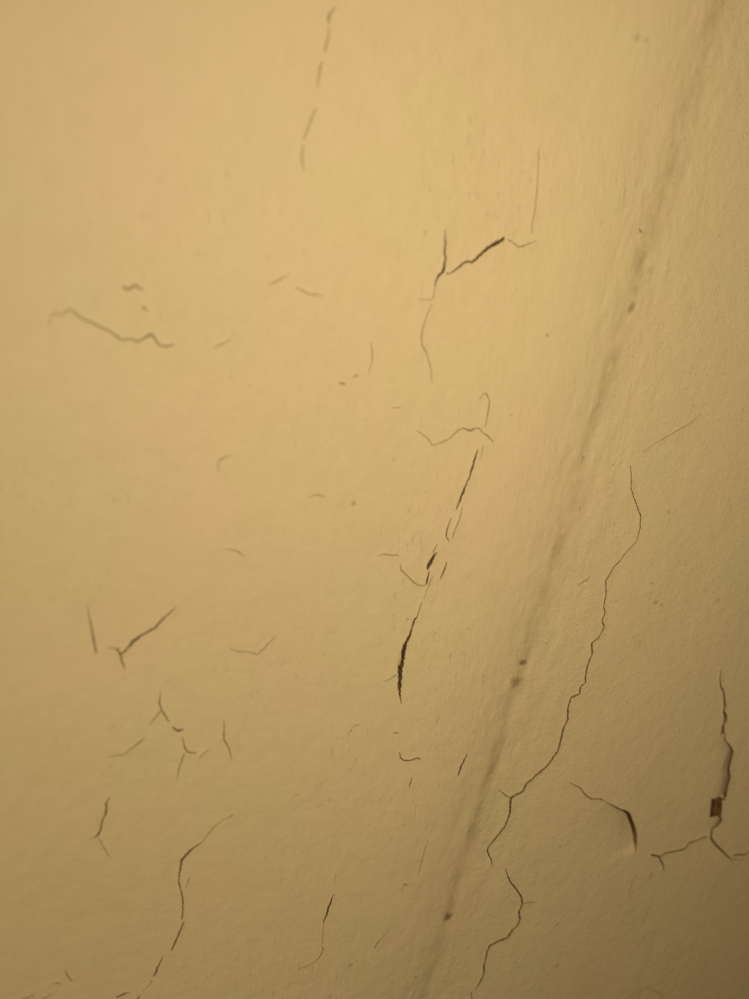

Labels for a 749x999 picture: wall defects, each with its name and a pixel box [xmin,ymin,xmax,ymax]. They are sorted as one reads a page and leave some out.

crack [49,284,175,347]
crack [421,147,540,381]
crack [89,797,110,857]
crack [87,606,175,670]
crack [116,814,233,999]
crack [377,393,493,704]
crack [471,413,708,998]
peeling [706,670,734,860]